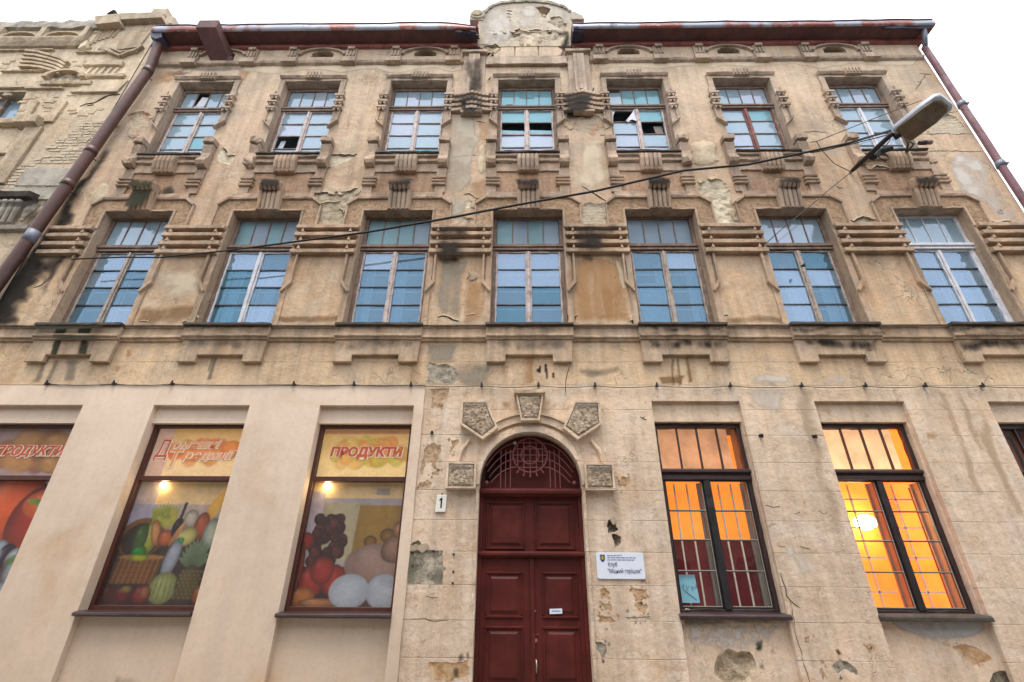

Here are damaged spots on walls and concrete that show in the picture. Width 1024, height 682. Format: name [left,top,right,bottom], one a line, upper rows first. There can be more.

flaking render [480,6,567,53]
flaking render [317,188,361,224]
flaking render [697,176,738,223]
leakage [39,258,63,280]
peeling [423,362,459,410]
spalling [607,516,621,547]
peeling [407,540,455,588]
peeling [595,579,652,663]
flaking render [714,649,756,682]
peeling [947,642,1009,682]